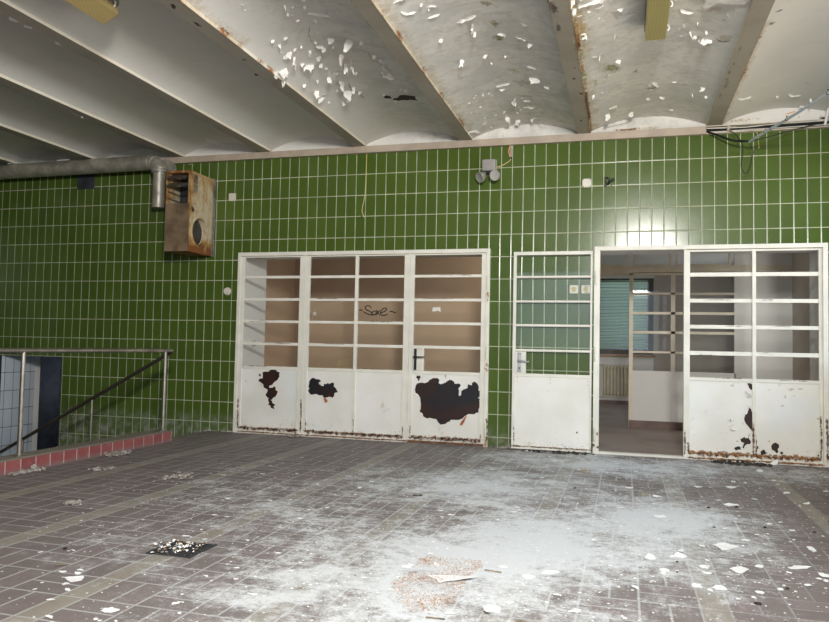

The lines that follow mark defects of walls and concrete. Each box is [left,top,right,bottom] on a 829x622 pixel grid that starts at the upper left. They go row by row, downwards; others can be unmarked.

peeling [457,15,476,38]
rust [569,4,586,51]
peeling [571,0,624,21]
peeling [670,0,733,46]
peeling [703,0,750,18]
peeling [271,0,395,106]
spalling [383,88,418,104]
peeling [468,83,543,135]
rust [684,383,829,466]